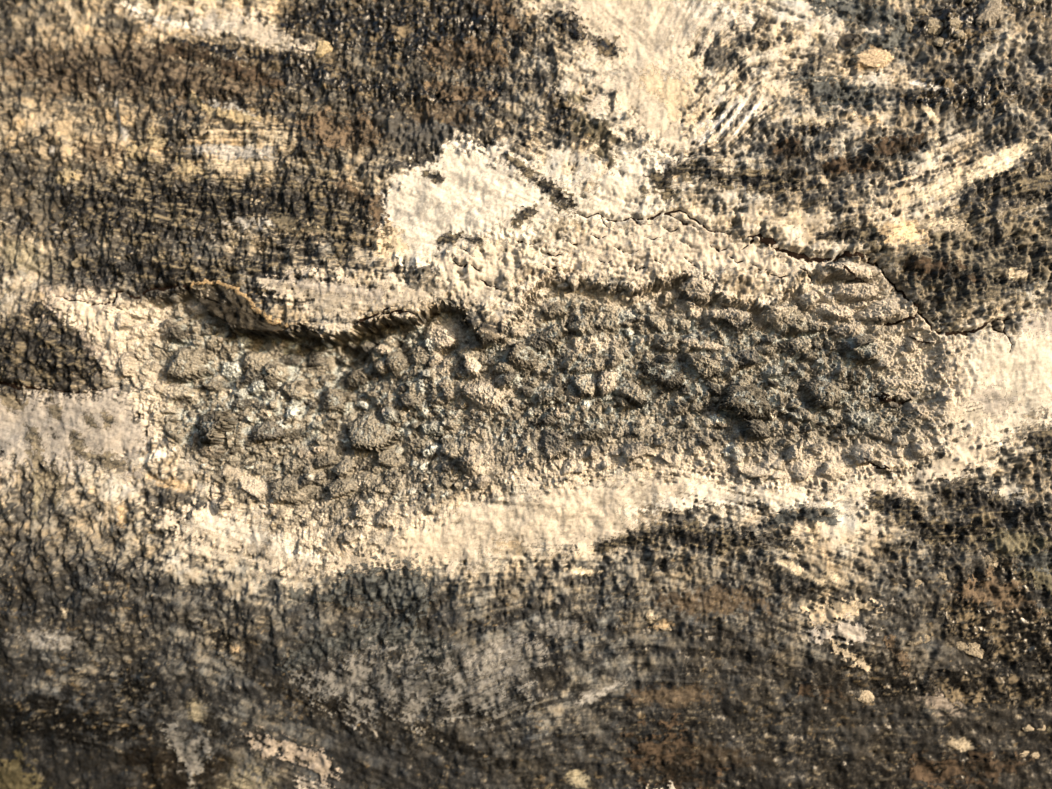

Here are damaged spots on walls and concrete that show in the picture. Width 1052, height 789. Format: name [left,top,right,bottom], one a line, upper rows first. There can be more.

water stain [806,0,1001,66]
water stain [898,69,1024,119]
water stain [974,167,1052,210]
water stain [0,0,889,505]
crack [517,210,1013,352]
water stain [902,252,990,297]
spalling [102,249,962,565]
water stain [145,310,1052,742]
water stain [160,721,216,785]
water stain [293,776,335,789]